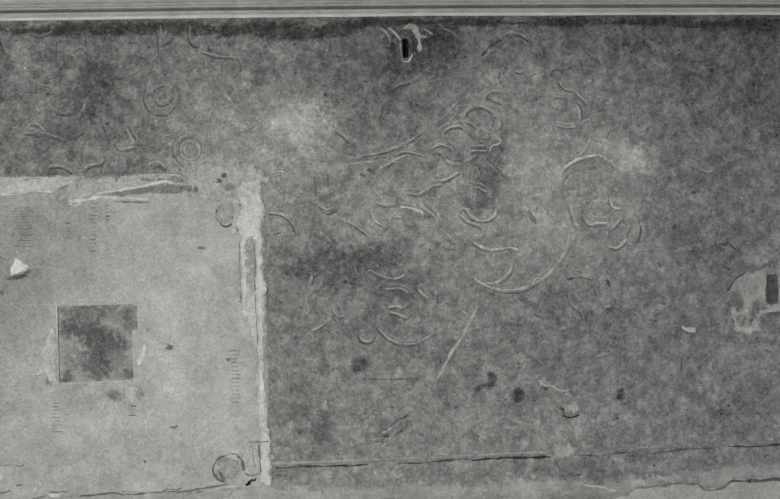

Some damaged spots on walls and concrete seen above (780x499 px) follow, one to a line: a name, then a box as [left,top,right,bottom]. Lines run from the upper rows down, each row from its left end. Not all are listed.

peeling [0,162,272,486]
spalling [727,260,780,336]